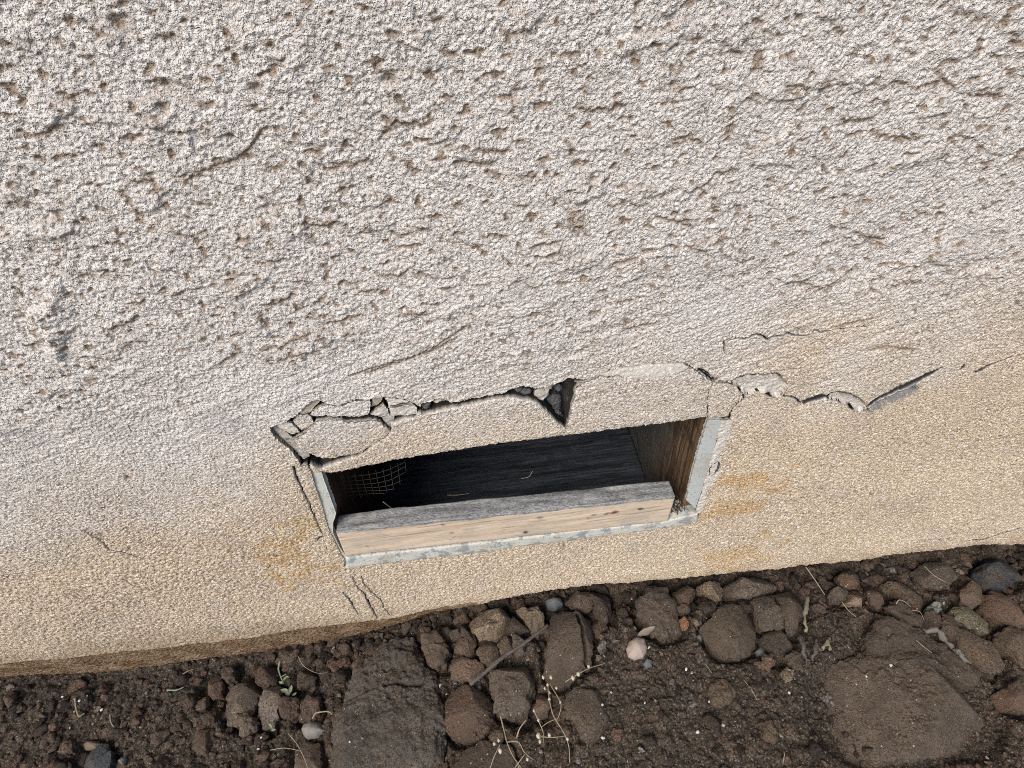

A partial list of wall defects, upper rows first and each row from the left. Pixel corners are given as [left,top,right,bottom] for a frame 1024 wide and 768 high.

flaking render [273,396,445,459]
spalling [514,378,572,416]
crack [574,354,1024,418]
crack [292,466,323,542]
crack [342,576,390,618]